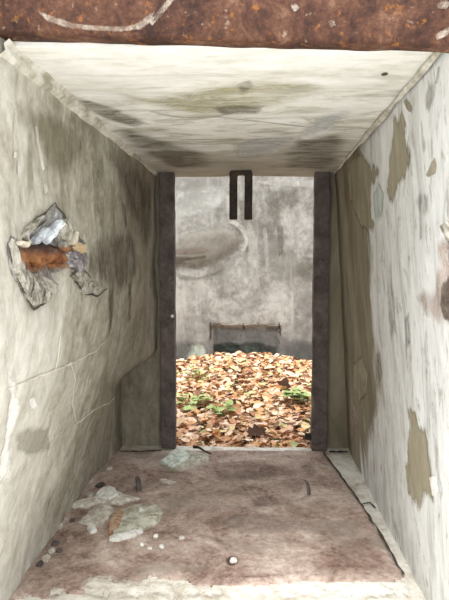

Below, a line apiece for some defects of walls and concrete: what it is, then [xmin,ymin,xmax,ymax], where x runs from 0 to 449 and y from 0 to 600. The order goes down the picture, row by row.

leakage [150,85,295,114]
leakage [82,101,200,167]
leakage [292,136,340,166]
peeling [387,99,411,201]
corrosion [20,242,68,267]
spalling [7,203,108,311]
peeling [405,408,438,507]